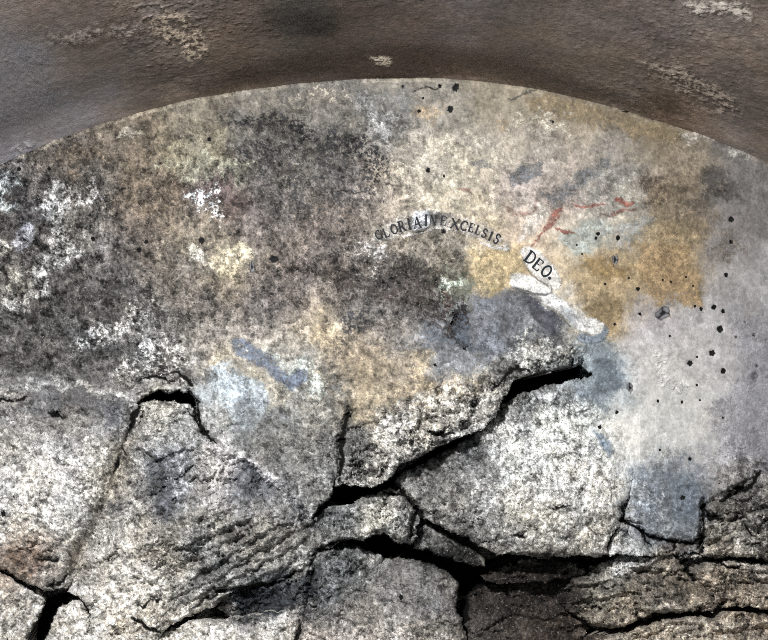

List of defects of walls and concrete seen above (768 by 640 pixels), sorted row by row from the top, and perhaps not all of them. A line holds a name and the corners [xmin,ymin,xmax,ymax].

water stain [177,103,401,237]
crack [114,370,218,472]
peeling [381,372,500,462]
crack [492,363,579,403]
peeling [655,350,698,404]
peeling [157,451,193,509]
peeling [203,438,279,488]
crack [190,407,527,625]
peeling [623,467,668,522]
crack [619,499,768,580]
crack [0,557,79,640]
crack [131,595,161,634]